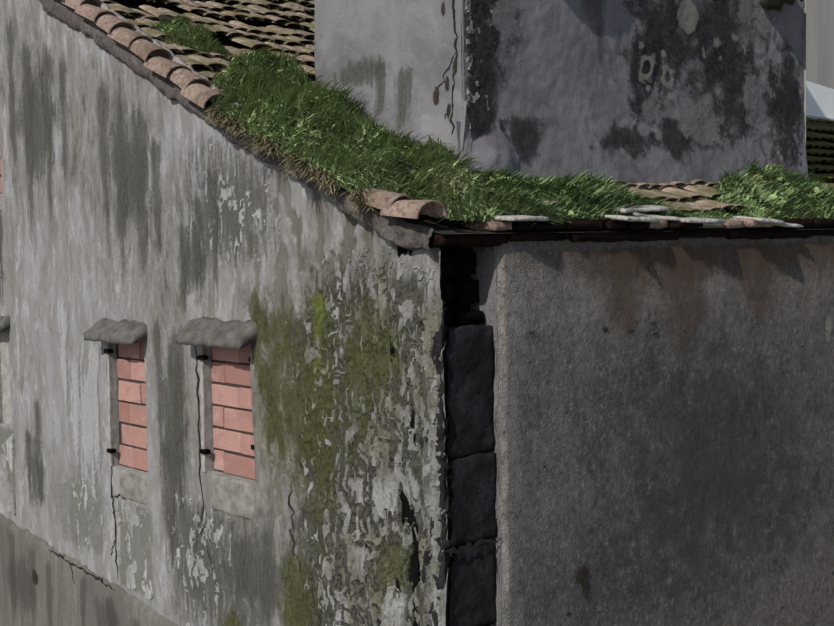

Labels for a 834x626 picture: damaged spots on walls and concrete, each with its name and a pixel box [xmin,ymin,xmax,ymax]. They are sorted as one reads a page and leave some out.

water stain [6,23,68,226]
water stain [97,86,161,266]
water stain [179,175,217,310]
peeling [179,143,281,267]
crack [437,0,458,135]
water stain [465,2,544,164]
water stain [590,28,692,162]
peeling [282,248,444,626]
peeling [57,475,107,559]
crack [48,466,126,590]
peeling [117,500,154,600]
peeling [167,494,232,626]